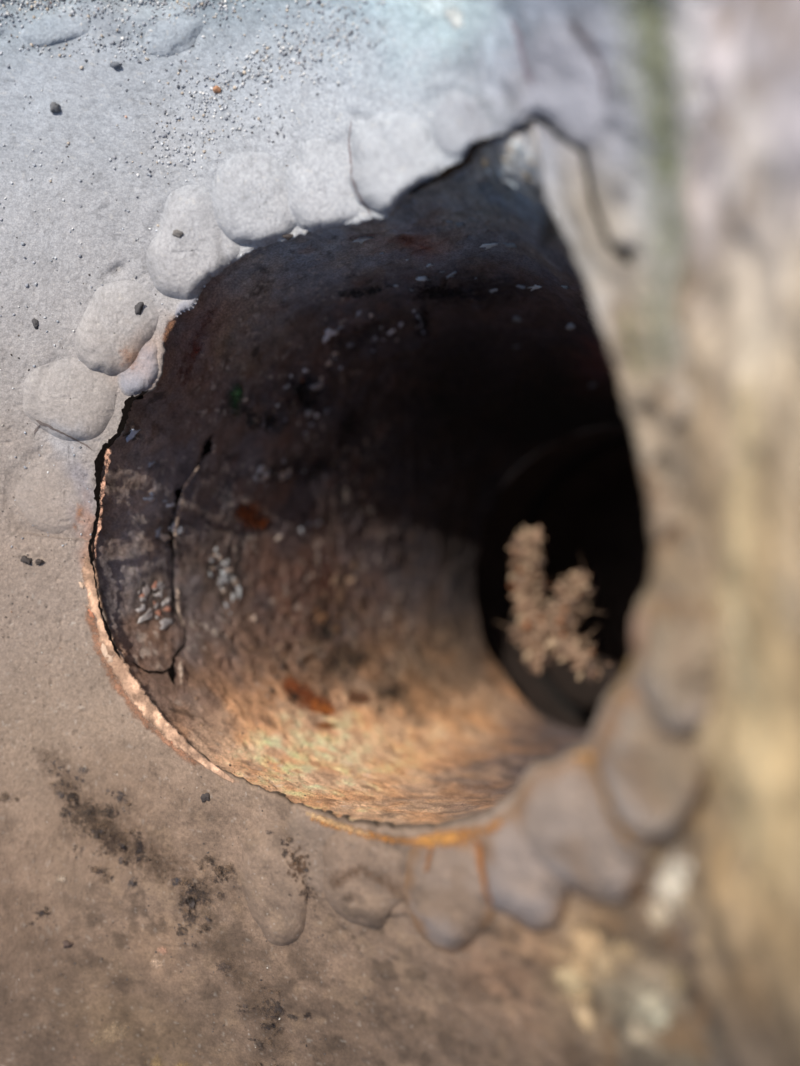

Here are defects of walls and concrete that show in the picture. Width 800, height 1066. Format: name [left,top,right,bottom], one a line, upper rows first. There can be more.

crack [509,18,534,87]
crack [568,20,607,101]
peeling [480,140,538,190]
crack [407,116,633,264]
peeling [394,263,542,298]
peeling [262,310,403,435]
peeling [143,492,184,546]
peeling [209,547,242,614]
spalling [79,558,235,783]
corrosion [282,677,339,729]
corrosion [347,689,370,705]
corrosion [306,812,502,905]